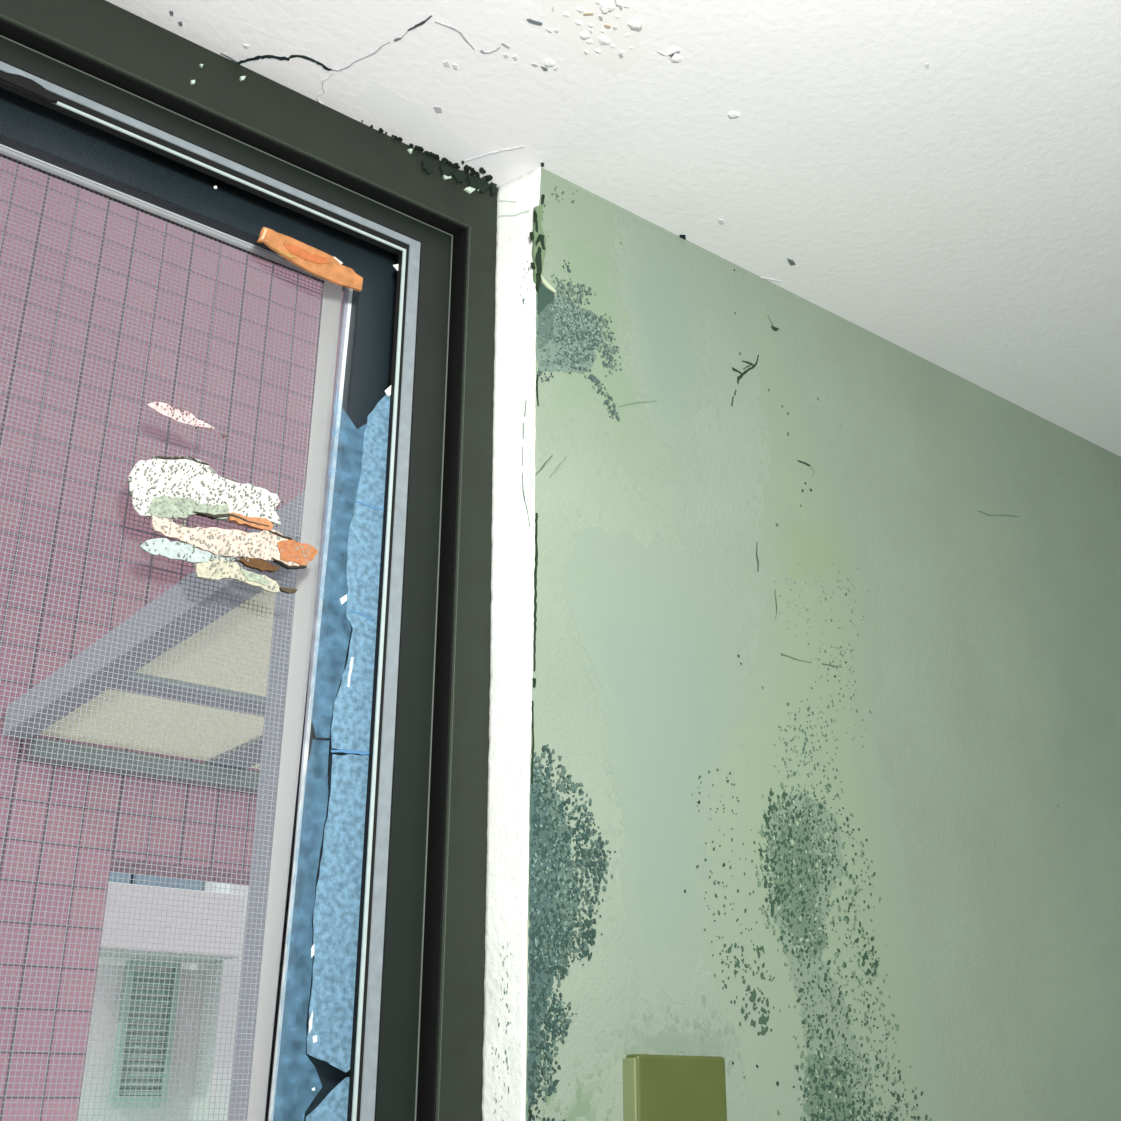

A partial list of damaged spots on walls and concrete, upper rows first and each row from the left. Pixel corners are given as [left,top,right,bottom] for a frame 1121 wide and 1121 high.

crack [221,16,501,104]
spalling [362,120,493,181]
damp [512,169,719,503]
damp [526,296,952,1121]